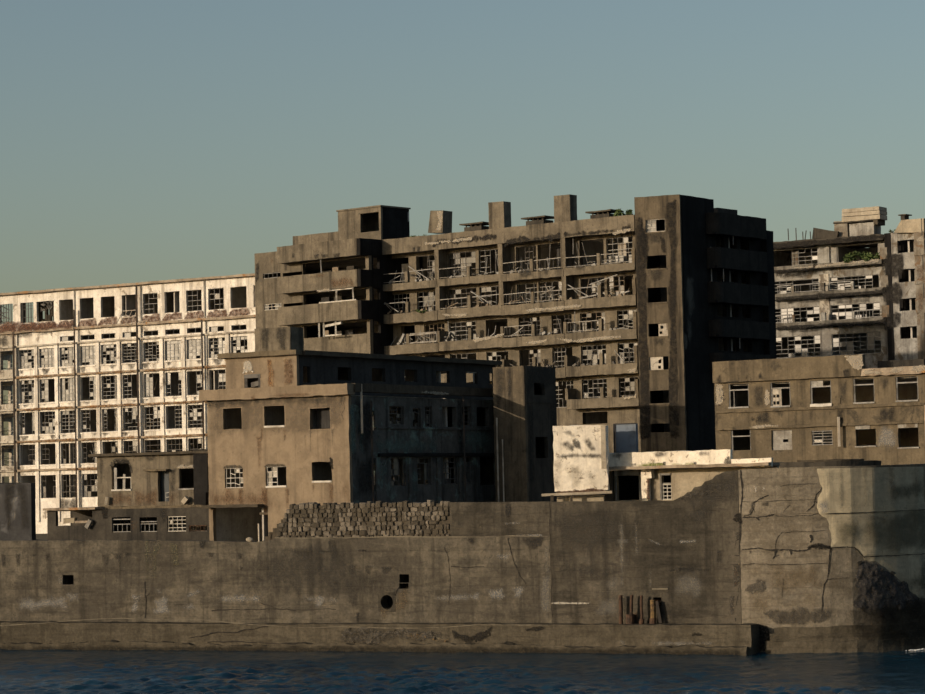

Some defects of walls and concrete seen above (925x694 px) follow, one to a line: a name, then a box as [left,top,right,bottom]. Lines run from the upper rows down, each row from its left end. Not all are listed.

crack [735,470,865,622]